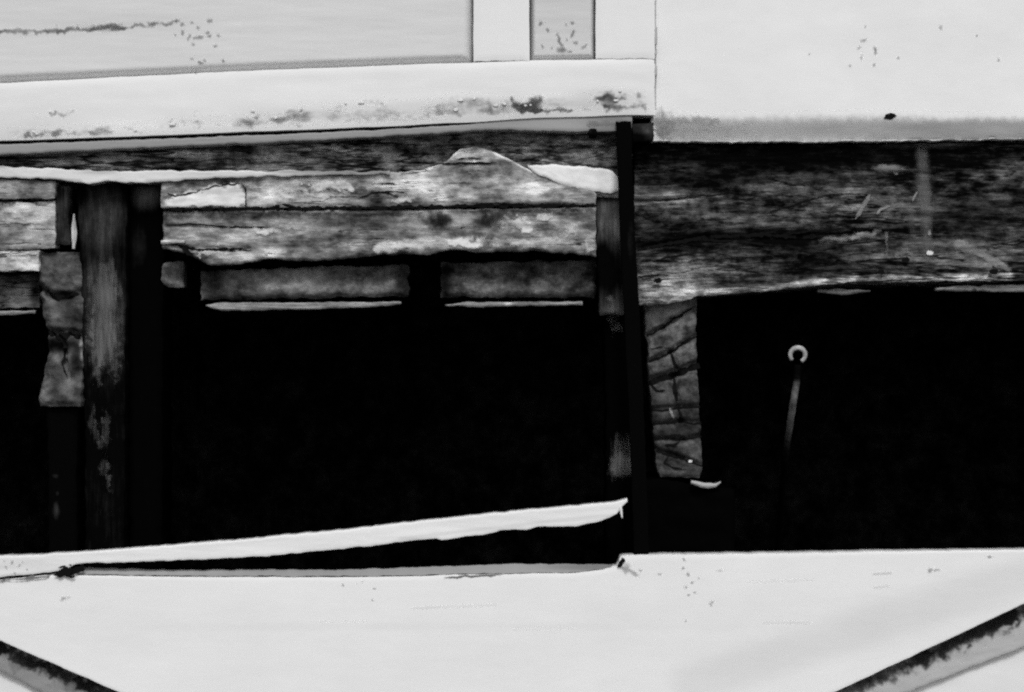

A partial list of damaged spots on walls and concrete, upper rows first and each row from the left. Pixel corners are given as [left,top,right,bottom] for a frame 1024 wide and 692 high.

peeling [596,90,623,109]